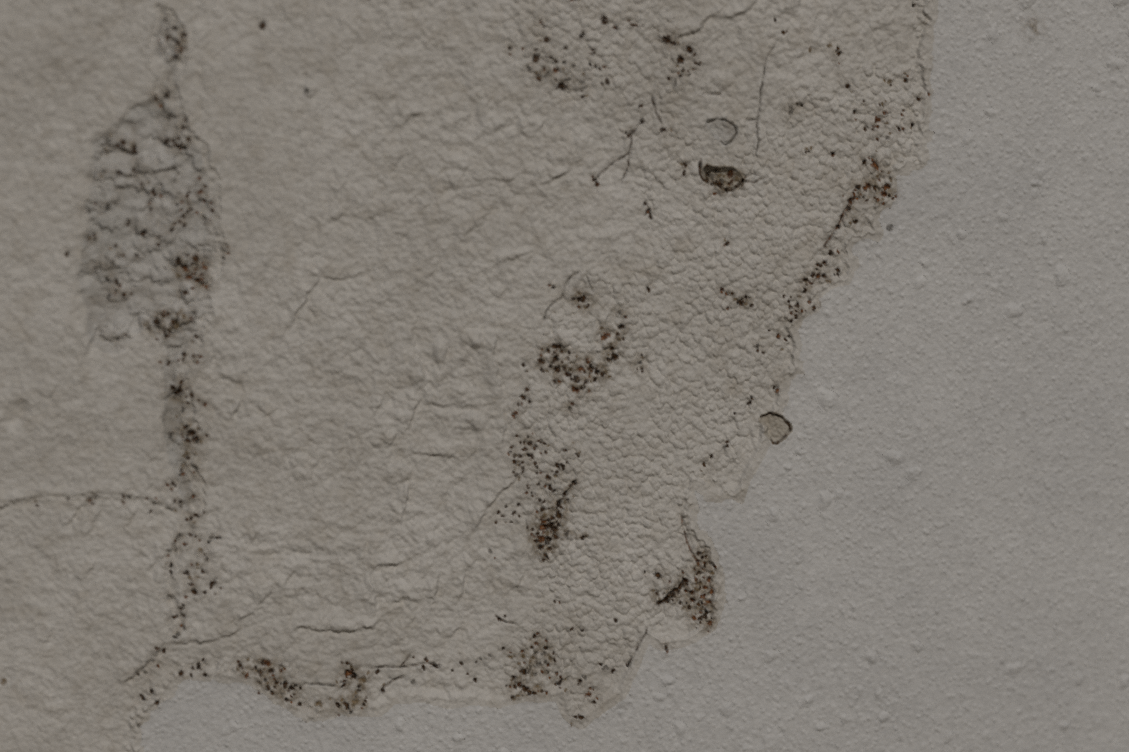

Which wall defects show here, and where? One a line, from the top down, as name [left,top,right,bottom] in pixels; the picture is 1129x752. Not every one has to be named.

peeling [0,0,771,752]
peeling [679,0,939,445]